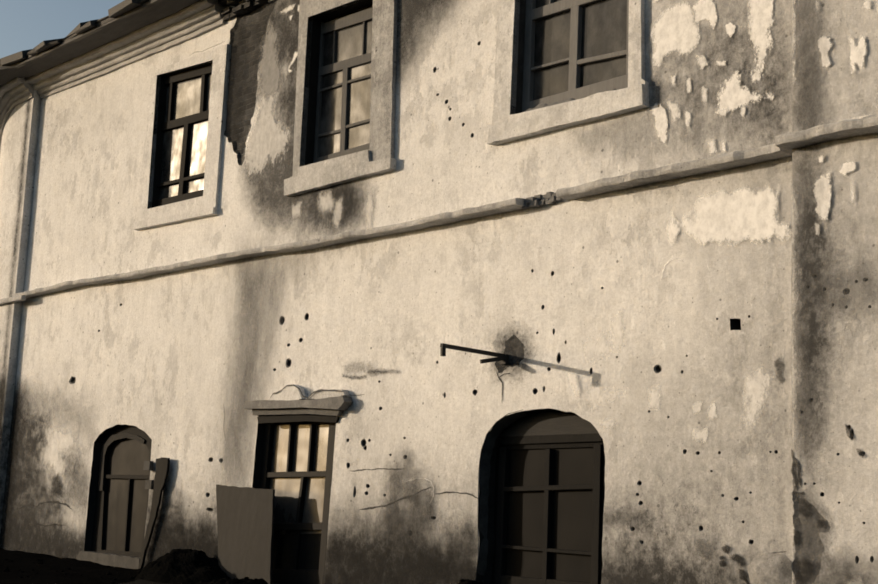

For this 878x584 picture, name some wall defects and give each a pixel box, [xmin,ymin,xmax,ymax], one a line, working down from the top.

spalling [224,2,291,175]
water stain [246,0,374,230]
peeling [650,0,736,67]
peeling [715,0,774,115]
peeling [850,36,867,73]
peeling [813,161,856,220]
peeling [667,186,817,315]
crack [269,368,398,400]
water stain [0,374,85,559]
water stain [323,458,476,584]
crack [359,487,479,510]
spalling [792,482,830,584]